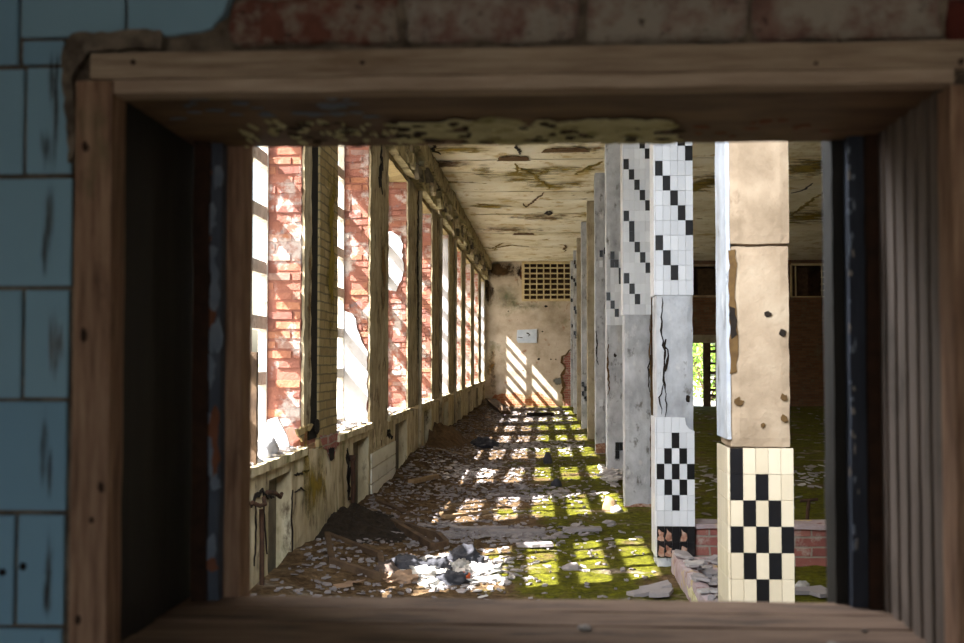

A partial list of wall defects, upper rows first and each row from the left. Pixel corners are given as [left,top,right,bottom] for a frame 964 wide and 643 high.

flaking render [229,0,964,48]
peeling [239,117,686,279]
damp [490,215,566,232]